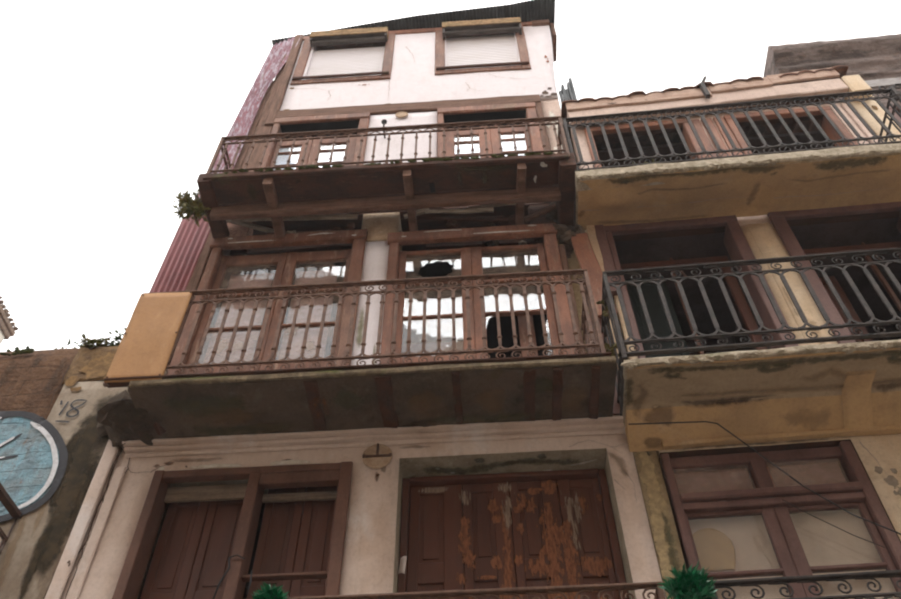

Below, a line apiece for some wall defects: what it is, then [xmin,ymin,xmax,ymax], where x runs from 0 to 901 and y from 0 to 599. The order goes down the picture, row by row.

damp [816,157,887,170]
damp [608,166,783,184]
damp [652,351,901,379]
damp [685,395,770,406]
damp [403,412,552,427]
damp [175,424,289,438]
damp [19,396,111,599]
peeling [454,469,614,599]